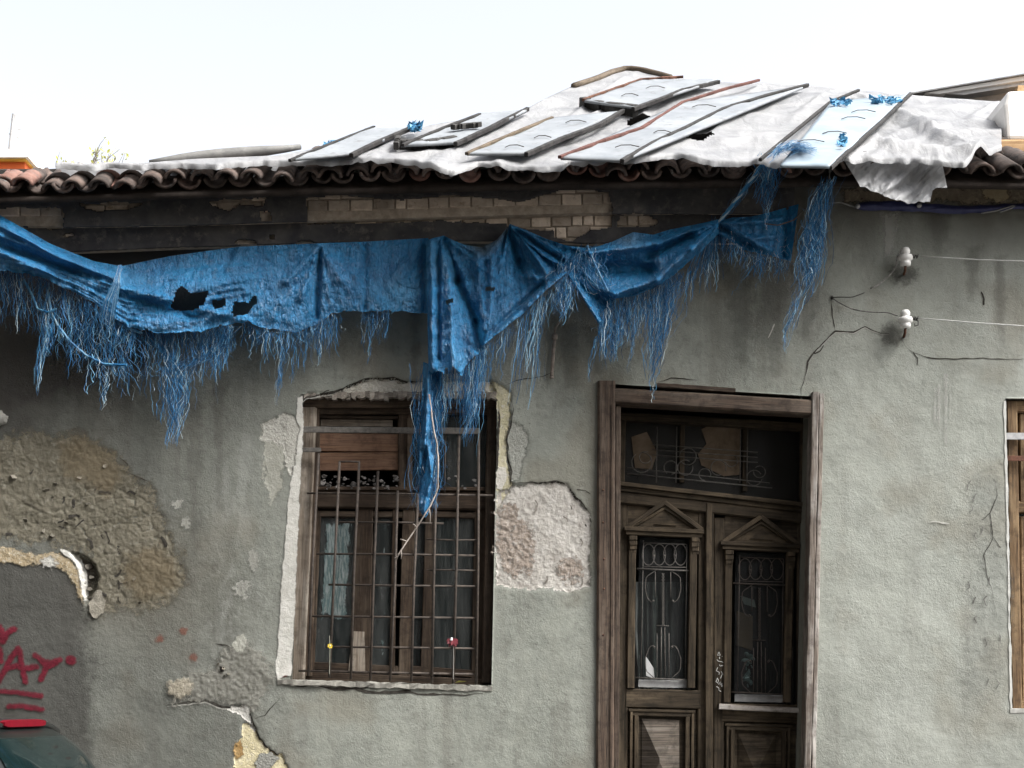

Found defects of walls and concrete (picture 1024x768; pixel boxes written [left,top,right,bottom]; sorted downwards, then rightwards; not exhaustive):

spalling [304,378,422,402]
crack [801,303,1009,390]
spalling [0,427,191,618]
peeling [259,412,300,506]
spalling [441,380,592,593]
crack [512,480,591,527]
crack [982,479,1001,594]
peeling [227,705,288,768]